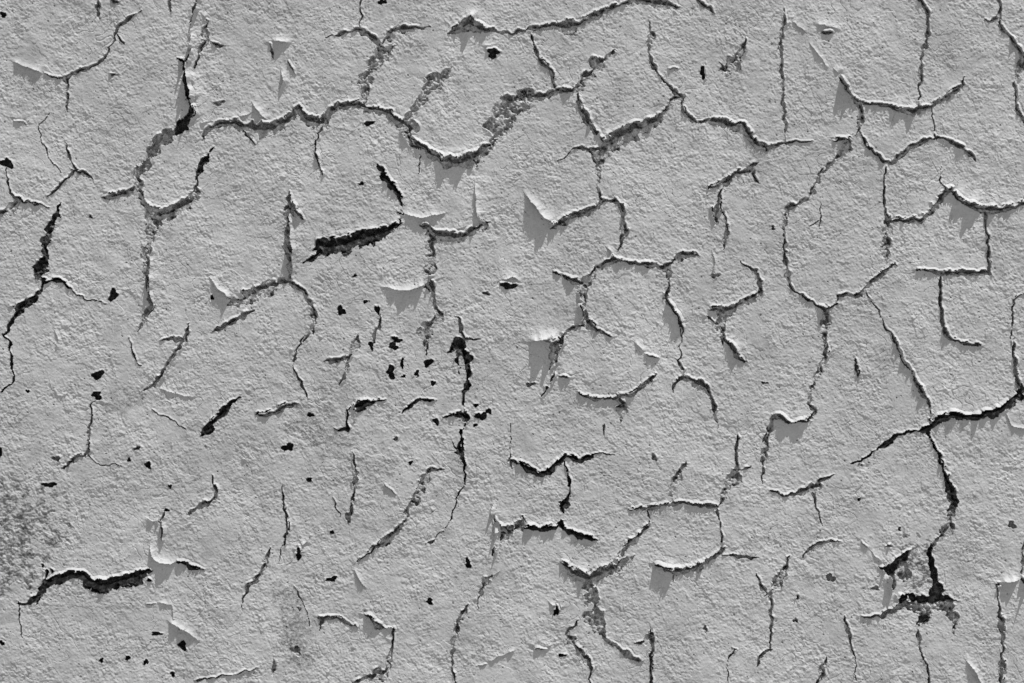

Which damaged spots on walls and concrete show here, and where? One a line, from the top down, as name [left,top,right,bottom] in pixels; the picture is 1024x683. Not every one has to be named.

crack [0,0,814,545]
spalling [363,300,434,380]
crack [559,0,1024,683]
spalling [473,404,492,427]
crack [18,474,221,638]
crack [241,485,293,608]
crack [353,466,444,588]
crack [449,423,612,683]
spalling [857,526,936,592]
crack [194,666,259,682]
crack [295,587,397,683]